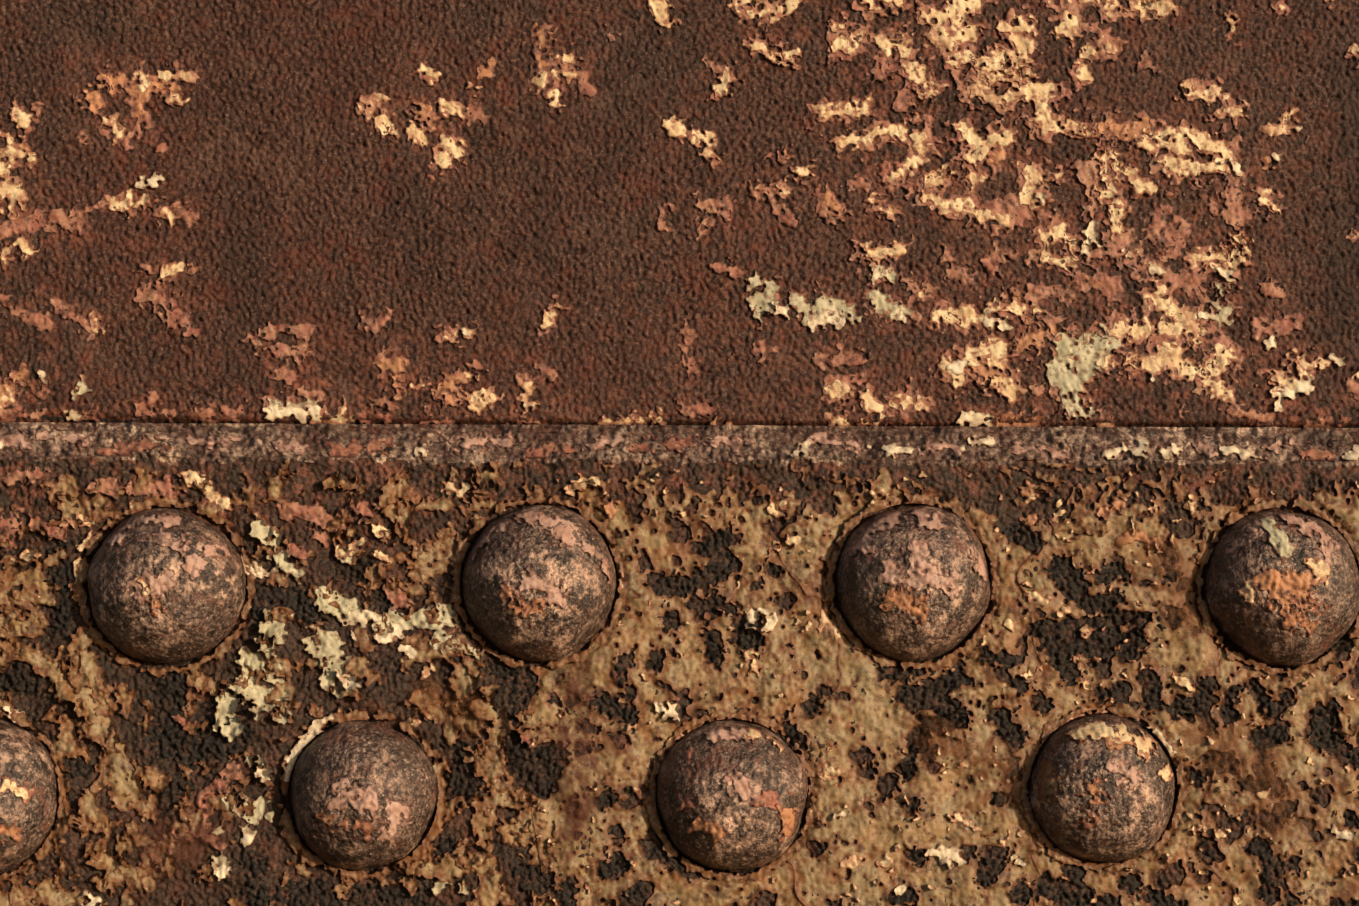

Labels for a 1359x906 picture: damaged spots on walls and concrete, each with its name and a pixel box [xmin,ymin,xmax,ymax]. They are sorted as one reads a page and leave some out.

peeling [0,97,202,271]
peeling [73,59,200,155]
peeling [355,56,497,181]
peeling [522,22,597,114]
rust [0,0,1359,436]
peeling [661,115,725,170]
peeling [701,0,1346,427]
peeling [0,360,177,456]
peeling [185,320,505,458]
peeling [790,337,936,490]
peeling [0,434,1359,906]
rust [0,457,1359,906]